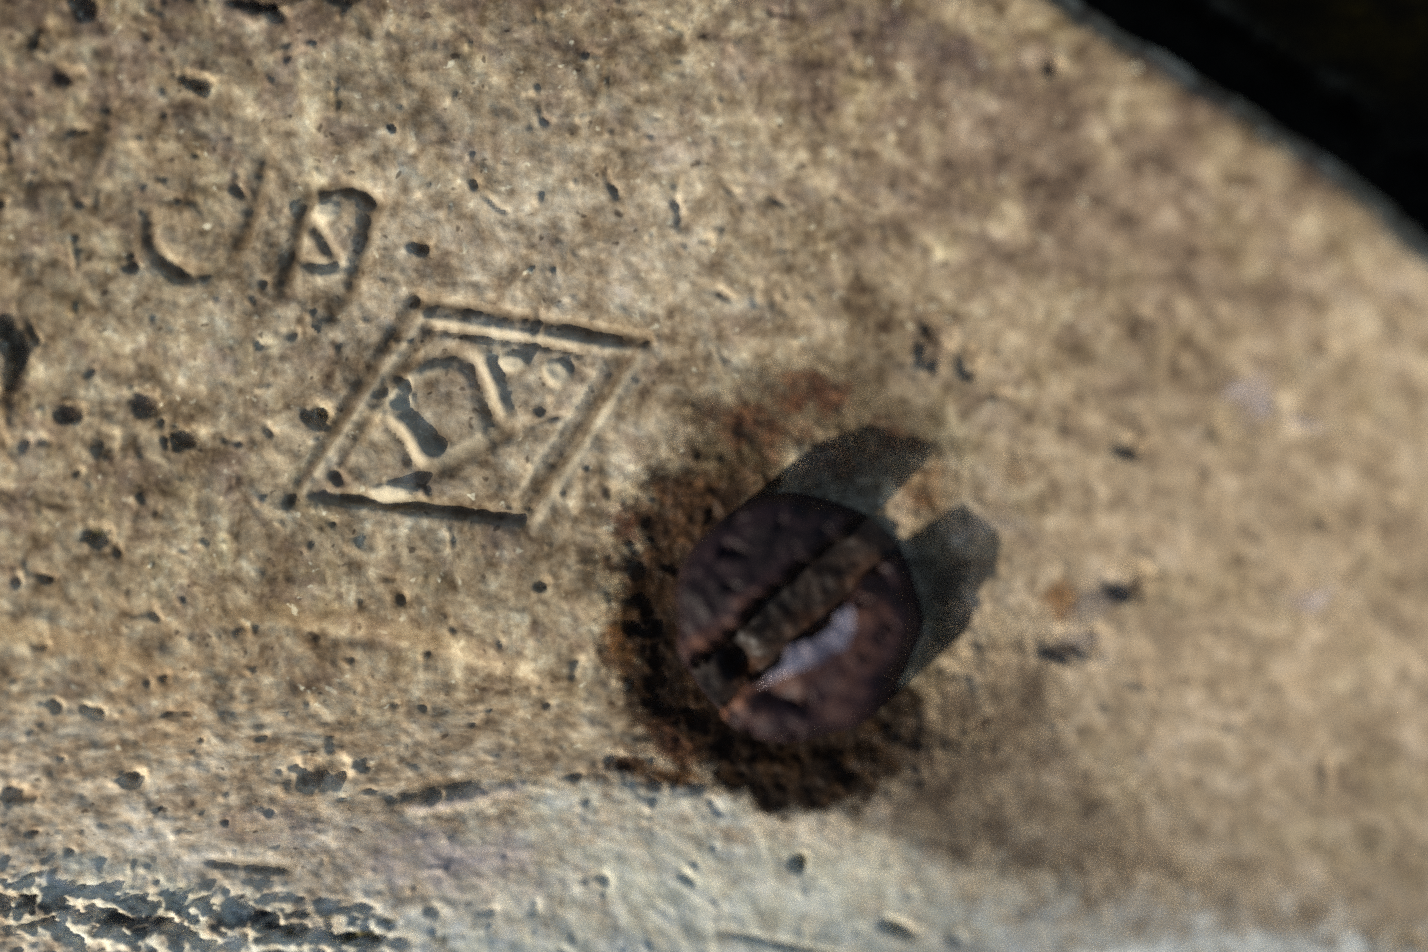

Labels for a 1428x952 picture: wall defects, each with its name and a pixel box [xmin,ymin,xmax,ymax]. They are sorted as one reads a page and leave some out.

corrosion [599,364,932,822]